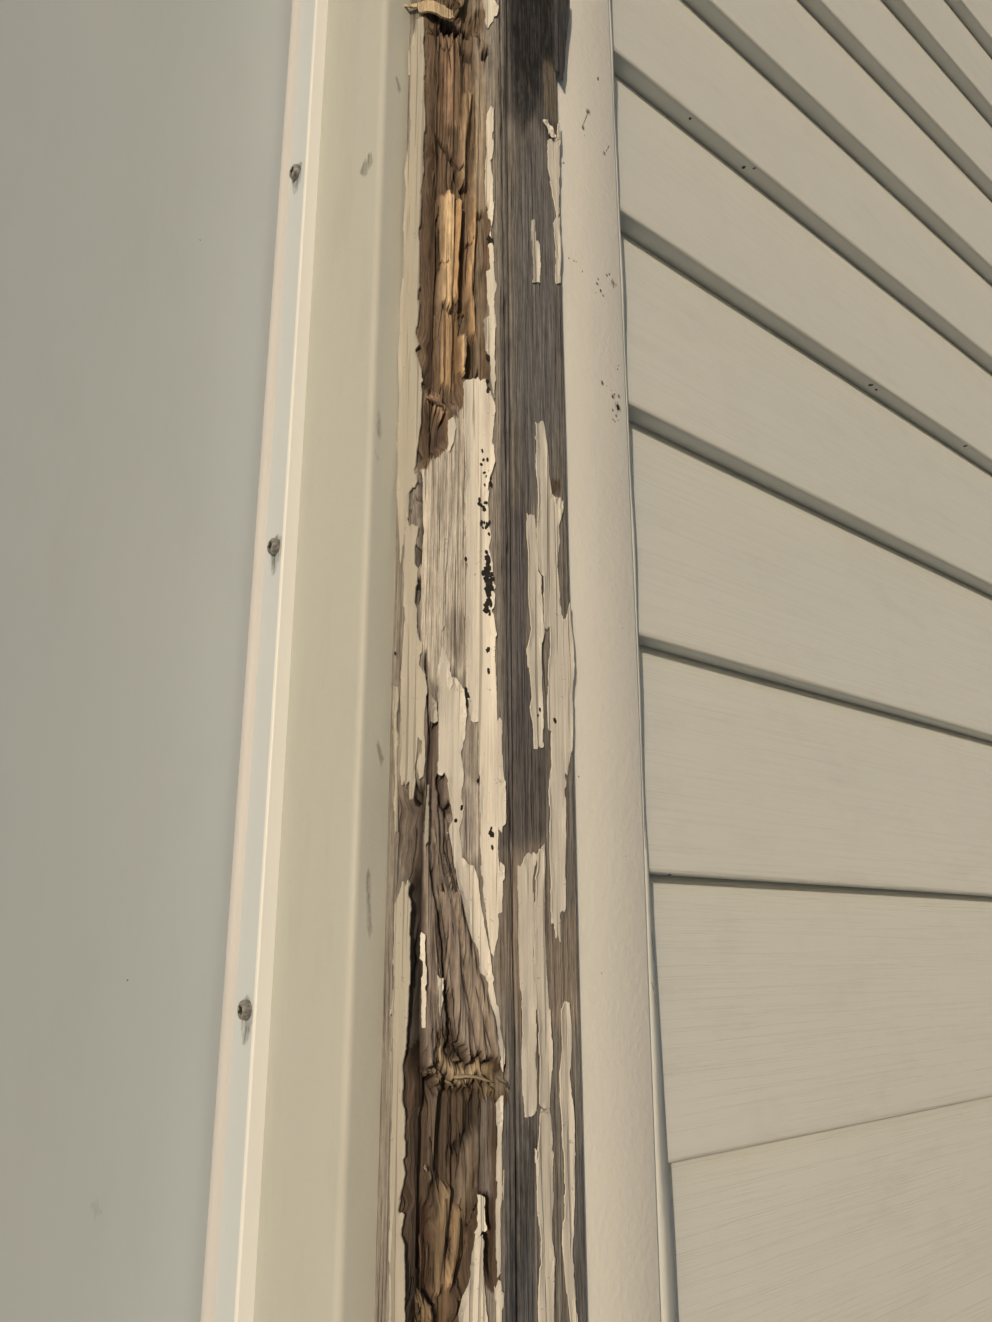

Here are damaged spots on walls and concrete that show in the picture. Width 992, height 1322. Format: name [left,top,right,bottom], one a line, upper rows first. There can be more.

peeling [482,0,499,29]
peeling [388,17,578,1322]